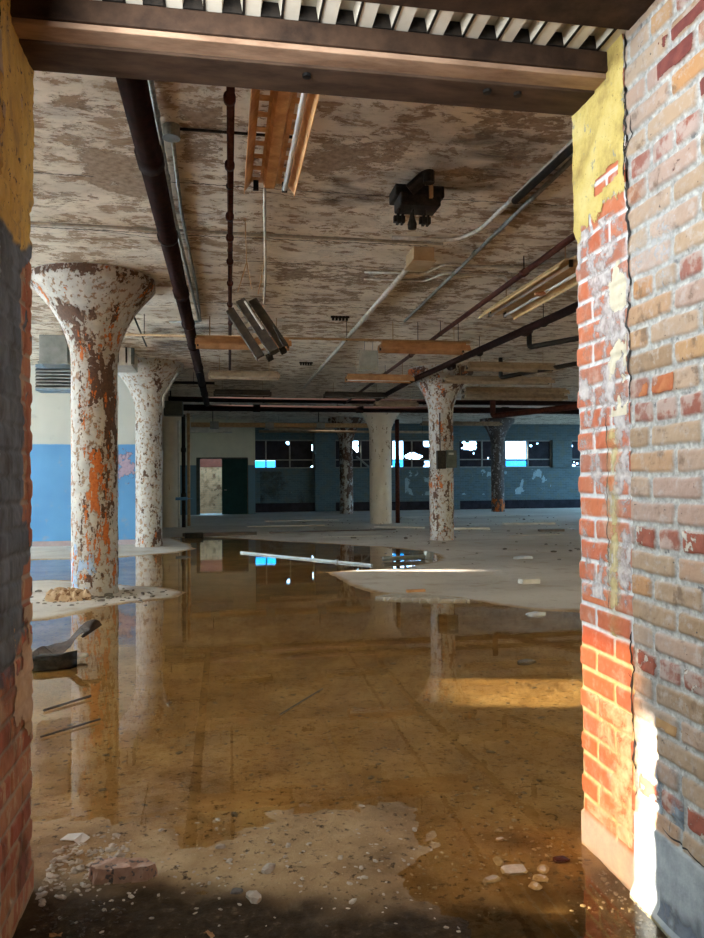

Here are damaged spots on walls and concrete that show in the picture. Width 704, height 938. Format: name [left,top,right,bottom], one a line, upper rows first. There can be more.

peeling [33,96,152,225]
peeling [177,98,223,163]
peeling [307,120,416,182]
peeling [250,241,384,305]
peeling [572,34,673,514]
crack [605,91,633,612]
peeling [23,239,177,589]
peeling [411,365,473,456]
peeling [405,467,466,540]
peeling [515,469,551,494]
peeling [583,526,655,605]
spalling [682,530,704,554]